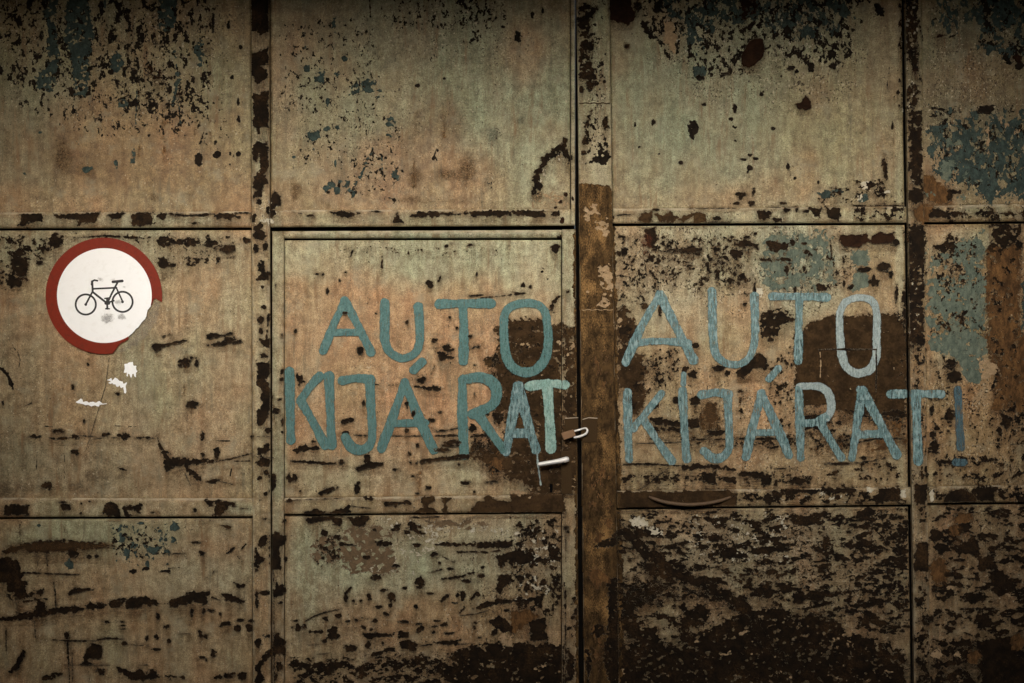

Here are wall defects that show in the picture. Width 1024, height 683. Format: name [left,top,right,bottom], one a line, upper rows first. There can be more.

peeling [0,0,241,169]
rust [577,0,641,96]
peeling [633,0,885,81]
rust [330,210,381,218]
rust [393,109,611,224]
peeling [925,104,1024,205]
rust [590,0,1024,683]
peeling [557,182,871,683]
rust [190,316,592,683]
spalling [0,587,245,621]
rust [182,630,217,662]
peeling [309,516,514,602]